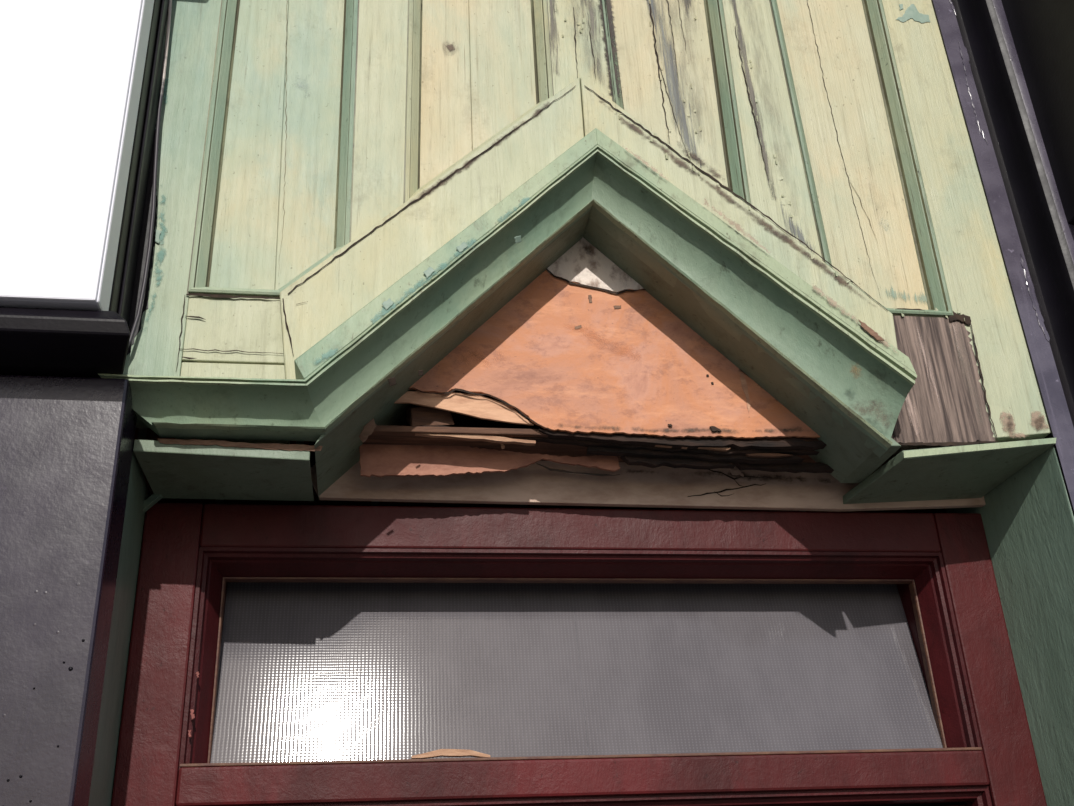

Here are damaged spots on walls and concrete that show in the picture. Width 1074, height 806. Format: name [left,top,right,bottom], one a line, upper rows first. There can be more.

peeling [896,4,930,23]
crack [807,2,881,297]
peeling [371,239,476,323]
peeling [813,286,1049,446]
spalling [444,390,543,429]
peeling [359,418,641,478]
crack [688,469,764,497]